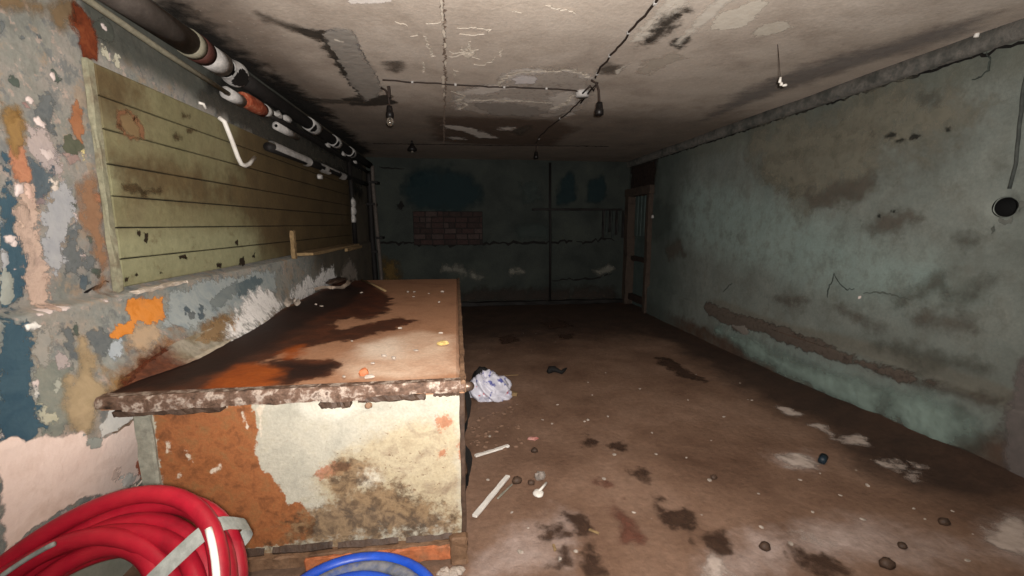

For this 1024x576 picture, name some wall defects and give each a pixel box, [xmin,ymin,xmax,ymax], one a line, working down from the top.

peeling [92,17,121,69]
crack [373,0,609,169]
leakage [645,8,691,49]
leakage [720,25,963,112]
leakage [748,79,976,213]
peeling [0,69,143,552]
peeling [119,268,301,384]
peeling [314,280,354,291]
crack [380,237,614,248]
flaking render [704,302,949,392]
crack [827,274,910,300]
peeling [69,558,133,576]